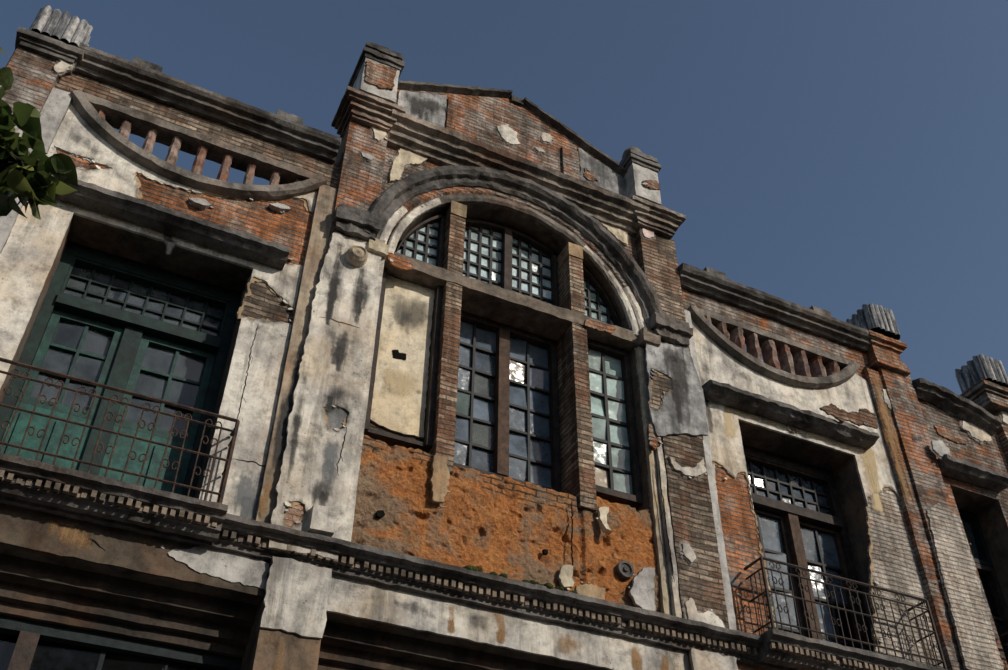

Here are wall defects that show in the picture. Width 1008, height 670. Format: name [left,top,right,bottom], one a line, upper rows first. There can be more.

peeling [389,148,428,183]
flaking render [134,173,313,266]
flaking render [236,277,294,324]
leakage [327,244,342,325]
leakage [353,269,368,321]
leakage [333,332,348,371]
leakage [275,355,301,465]
leakage [328,390,342,411]
leakage [313,443,338,506]
peeling [161,545,269,590]
flaking render [351,435,661,612]
flaking render [667,456,776,635]